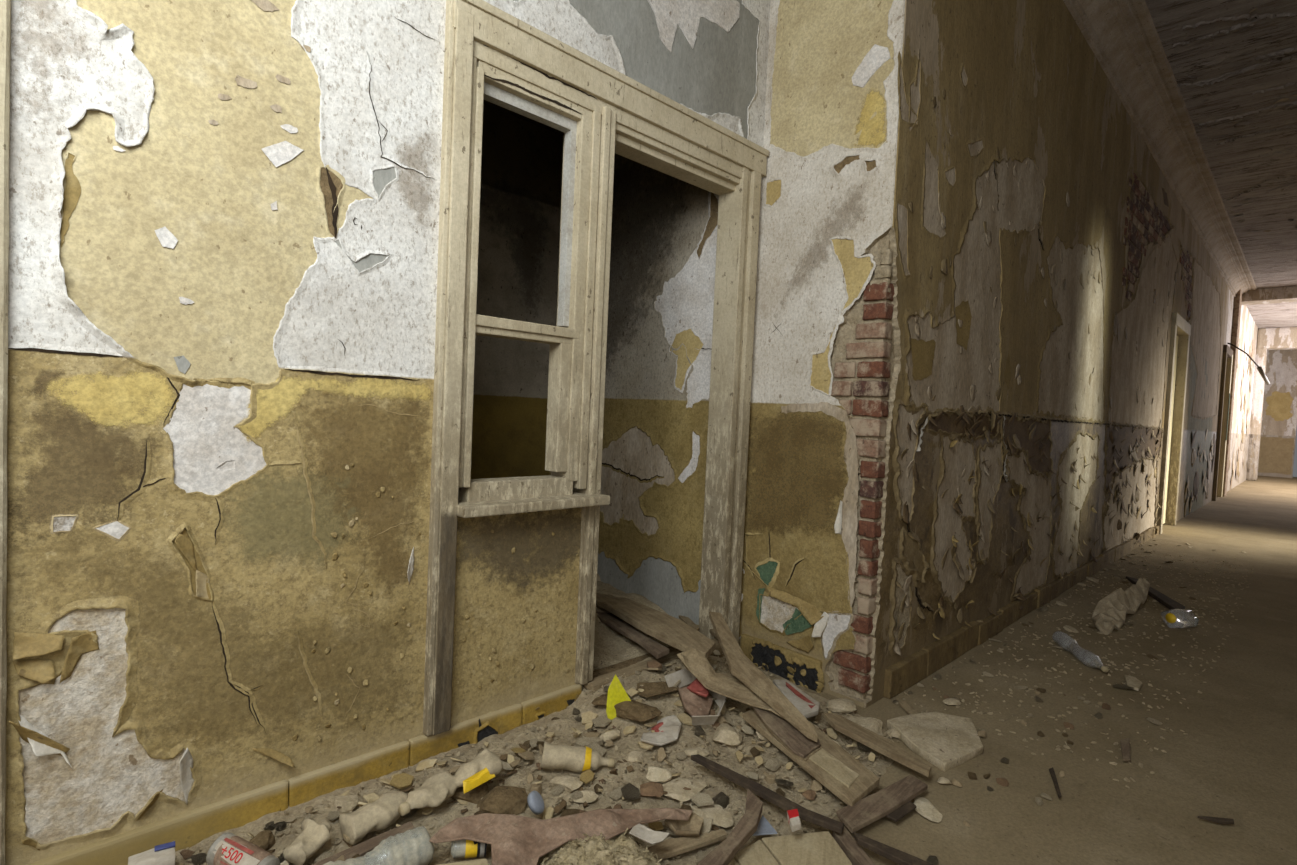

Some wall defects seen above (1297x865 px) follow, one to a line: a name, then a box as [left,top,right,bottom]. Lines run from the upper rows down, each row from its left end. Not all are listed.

crack [117,377,180,521]
crack [214,498,225,545]
peeling [45,0,400,502]
peeling [568,0,1294,693]
peeling [6,595,202,851]
crack [212,601,267,733]